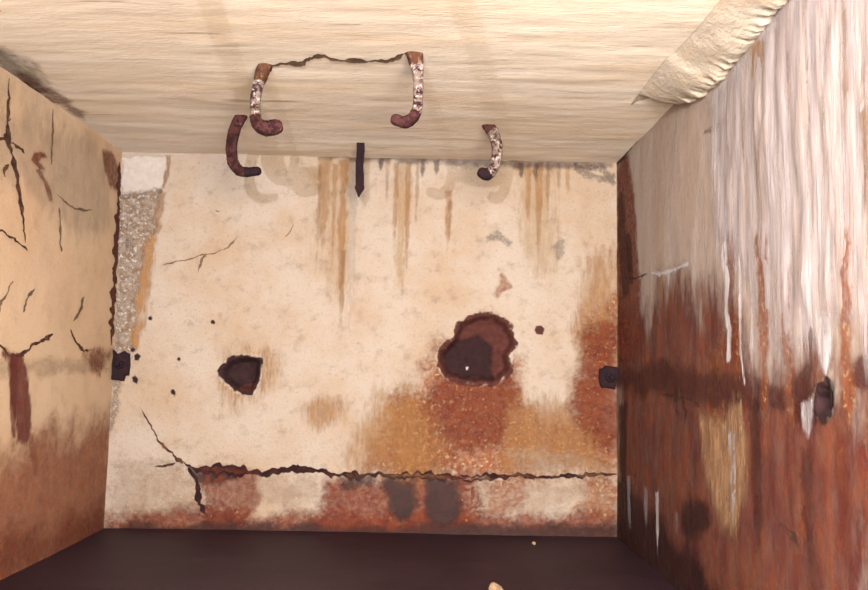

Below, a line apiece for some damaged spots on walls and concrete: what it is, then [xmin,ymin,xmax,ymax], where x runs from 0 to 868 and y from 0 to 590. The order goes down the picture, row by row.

crack [0,78,28,251]
crack [0,281,35,312]
crack [0,333,53,356]
crack [58,195,91,252]
crack [74,297,84,320]
crack [103,152,122,345]
spalling [113,155,170,360]
spalling [217,354,263,395]
rust [0,153,868,590]
spalling [437,312,518,387]
damp [618,0,868,407]
crack [142,411,617,517]